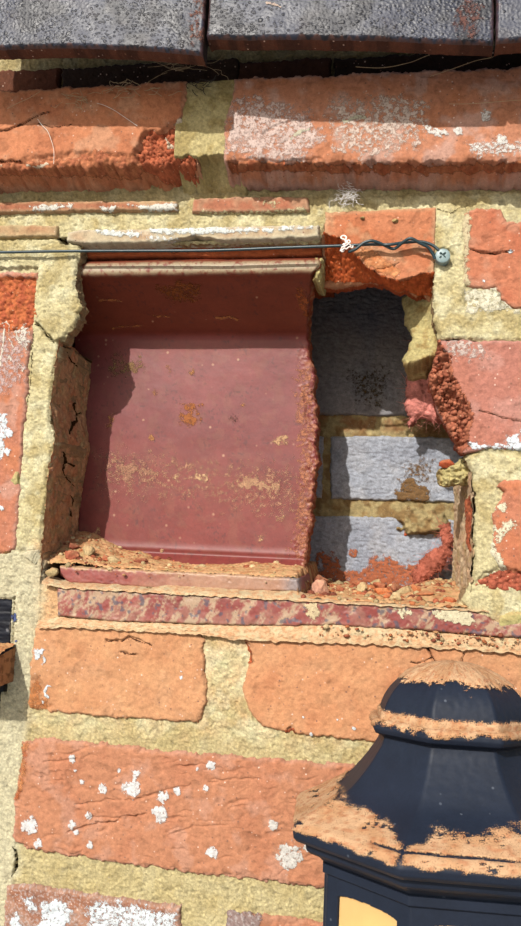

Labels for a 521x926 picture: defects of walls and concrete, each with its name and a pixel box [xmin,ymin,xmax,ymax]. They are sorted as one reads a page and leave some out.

crack [0,111,72,132]
spalling [0,129,200,187]
spalling [0,276,37,332]
leakage [0,332,27,393]
spalling [305,232,435,568]
spalling [428,340,475,455]
leakage [0,413,13,459]
spalling [477,569,521,591]
leakage [10,896,73,926]
leakage [84,899,177,926]